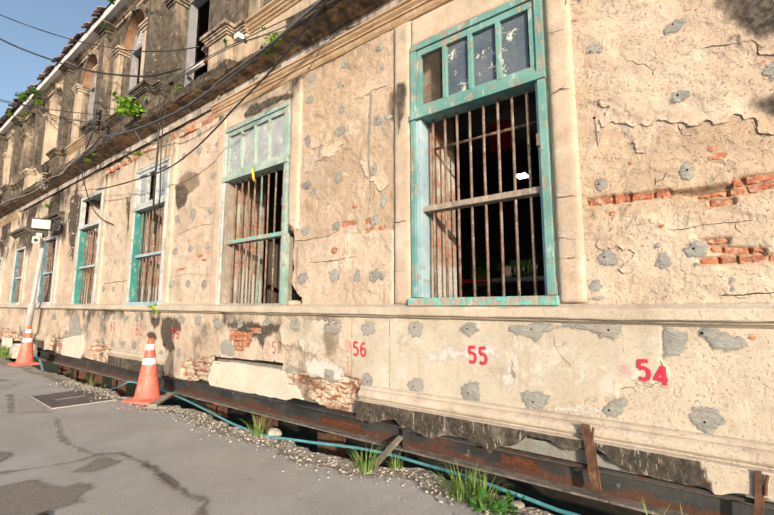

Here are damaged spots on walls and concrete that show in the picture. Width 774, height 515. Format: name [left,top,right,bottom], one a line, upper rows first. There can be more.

mould [718,0,774,36]
crack [705,39,763,55]
leakage [389,83,406,127]
leakage [175,173,199,209]
flaking render [588,175,774,216]
crack [669,220,749,233]
flaking render [700,239,774,264]
spalling [287,285,302,306]
crack [720,291,774,299]
leakage [147,317,181,351]
flaking render [280,319,343,354]
crack [0,383,208,515]